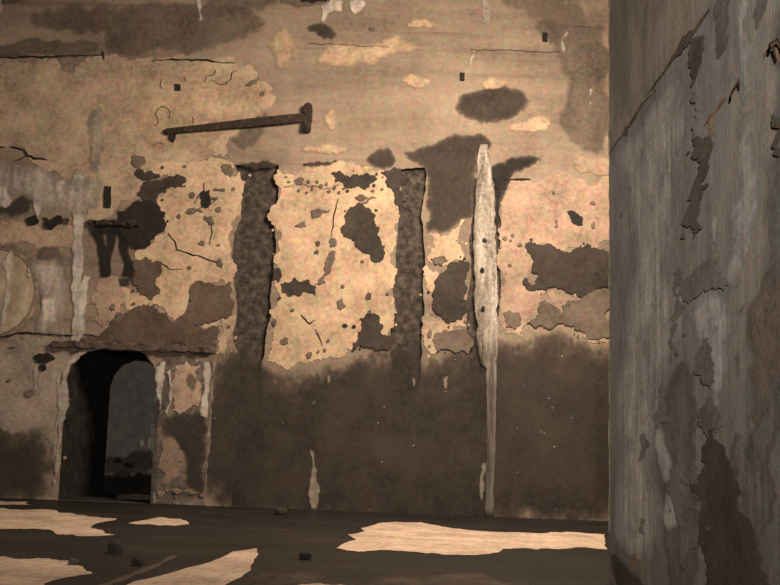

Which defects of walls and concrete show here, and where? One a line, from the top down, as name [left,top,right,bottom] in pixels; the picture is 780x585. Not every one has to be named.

crack [0,51,105,60]
damp [0,0,417,67]
crack [0,146,48,161]
damp [713,0,767,286]
spalling [771,113,780,157]
peeling [0,335,71,464]
damp [0,110,134,499]
damp [103,0,700,585]
spalling [668,257,729,360]
damp [692,292,730,405]
spalling [665,337,770,585]
damp [731,364,780,552]